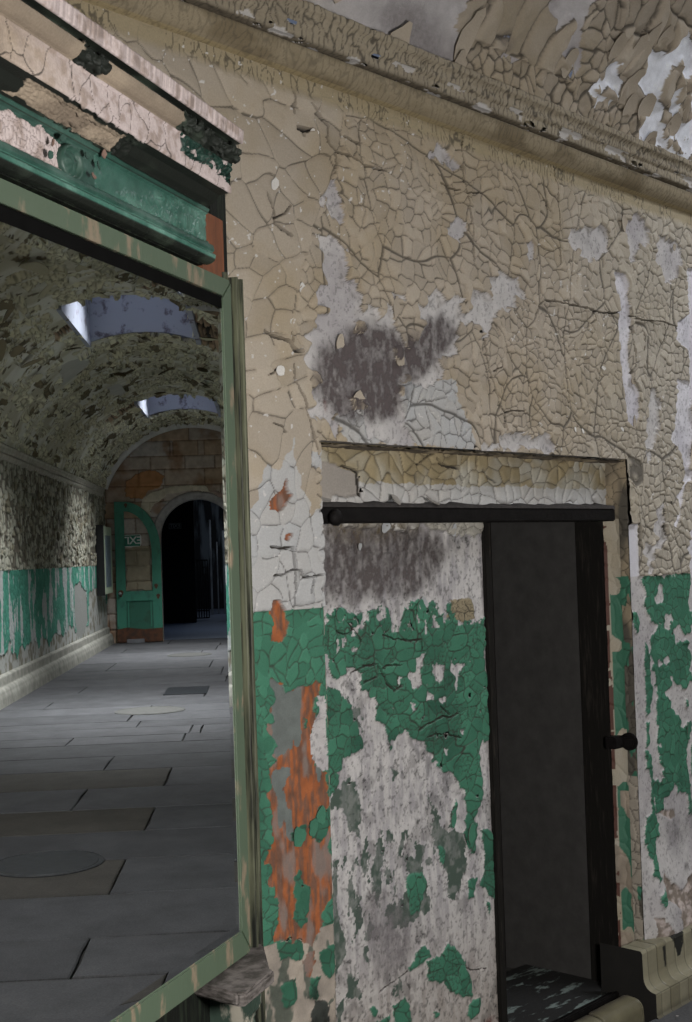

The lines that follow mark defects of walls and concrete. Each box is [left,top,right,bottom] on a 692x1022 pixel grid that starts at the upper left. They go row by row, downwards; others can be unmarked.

crack [291,90,388,174]
peeling [305,0,486,68]
peeling [589,22,692,162]
crack [264,329,319,450]
peeling [304,234,527,446]
crack [535,299,677,374]
crack [341,461,362,497]
rust [269,599,290,642]
crack [270,545,325,608]
peeling [614,212,692,940]
rust [264,677,333,977]
peeling [264,523,498,1022]